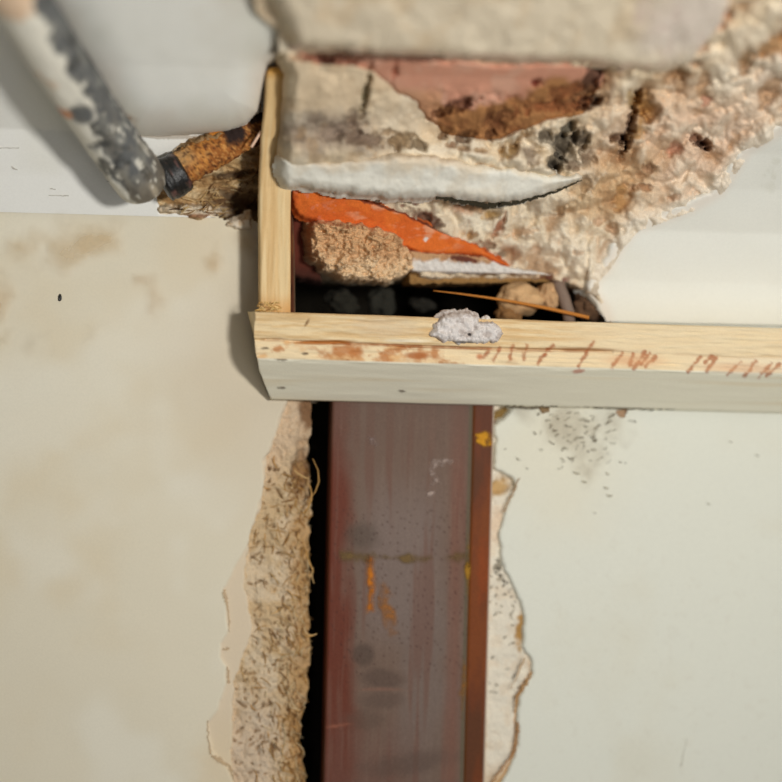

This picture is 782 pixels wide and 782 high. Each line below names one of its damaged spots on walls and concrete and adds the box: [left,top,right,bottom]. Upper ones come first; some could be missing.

spalling [255,0,782,321]
spalling [230,400,320,782]
corrosion [341,553,395,620]
spalling [494,406,507,423]
spalling [485,470,532,782]
spalling [537,407,573,460]